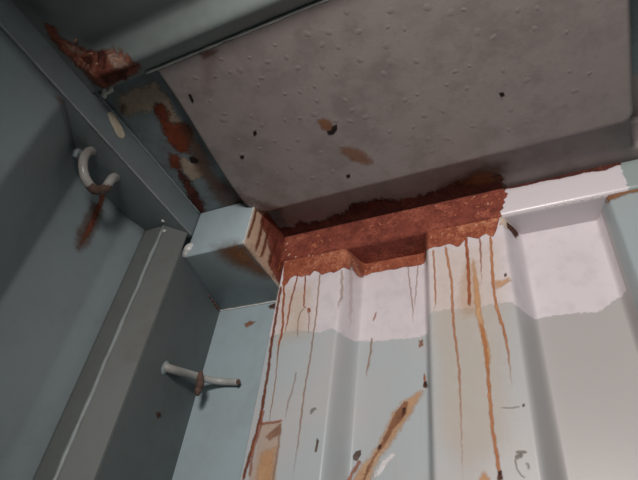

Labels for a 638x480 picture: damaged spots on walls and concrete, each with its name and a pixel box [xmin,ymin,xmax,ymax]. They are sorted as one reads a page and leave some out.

rust [45,23,141,88]
rust [154,103,246,213]
rust [319,119,337,135]
rust [79,182,112,244]
rust [219,162,621,480]